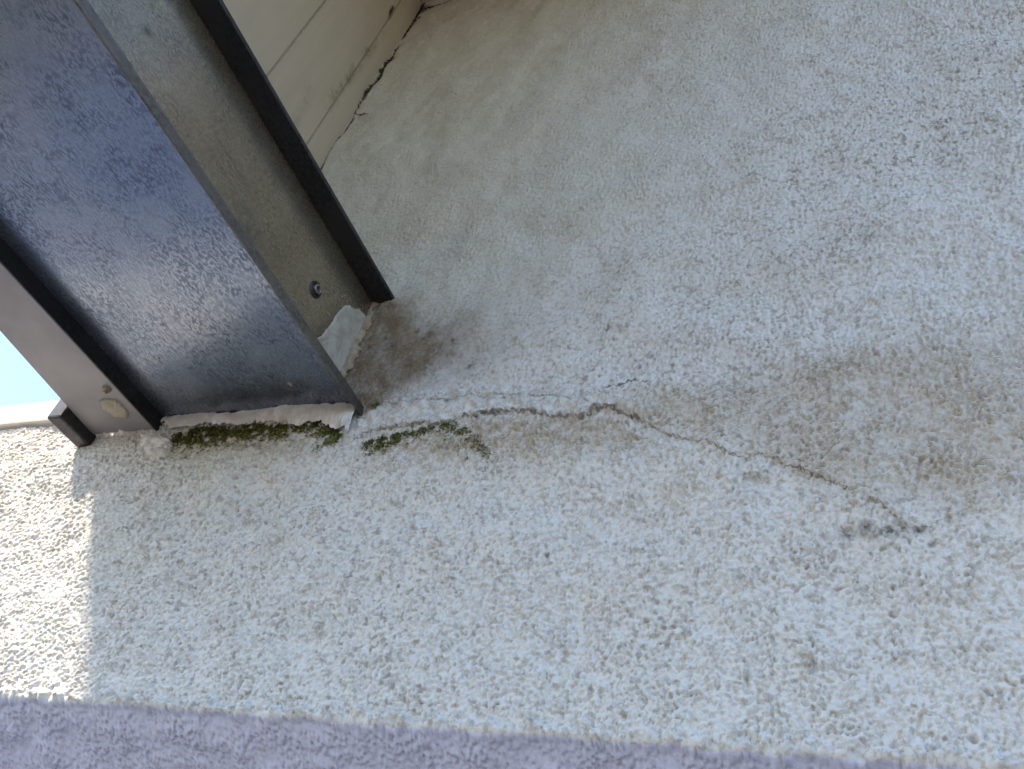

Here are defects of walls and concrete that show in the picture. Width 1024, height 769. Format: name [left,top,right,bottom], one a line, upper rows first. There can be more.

crack [338,0,450,139]